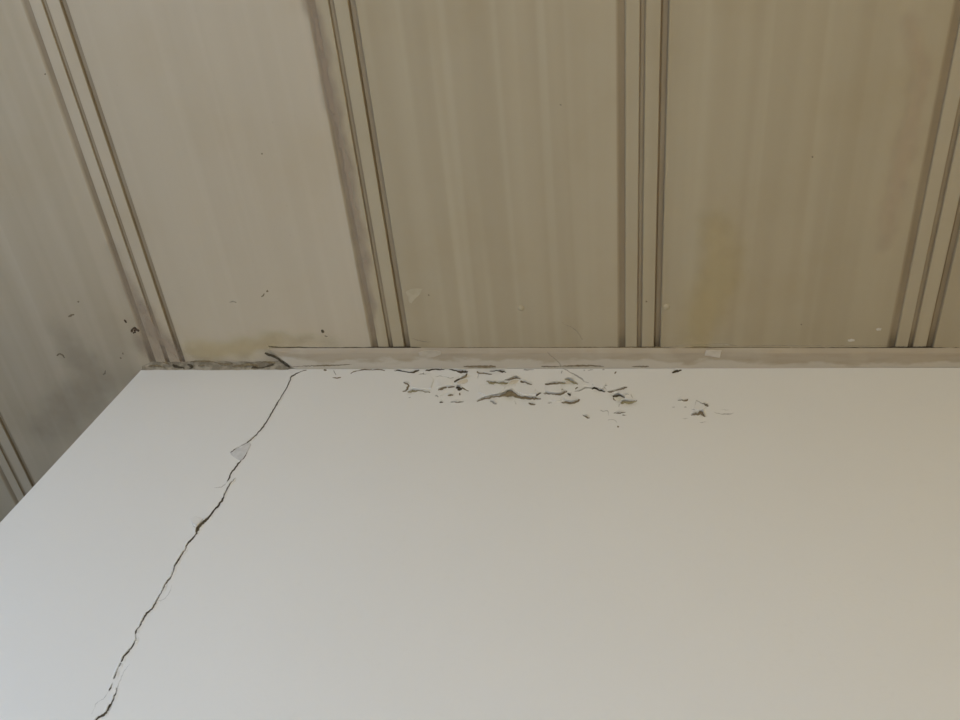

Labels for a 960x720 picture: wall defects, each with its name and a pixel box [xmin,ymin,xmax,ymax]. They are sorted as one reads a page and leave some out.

crack [458,344,957,368]
peeling [394,368,637,427]
peeling [678,396,709,417]
crack [92,346,421,720]